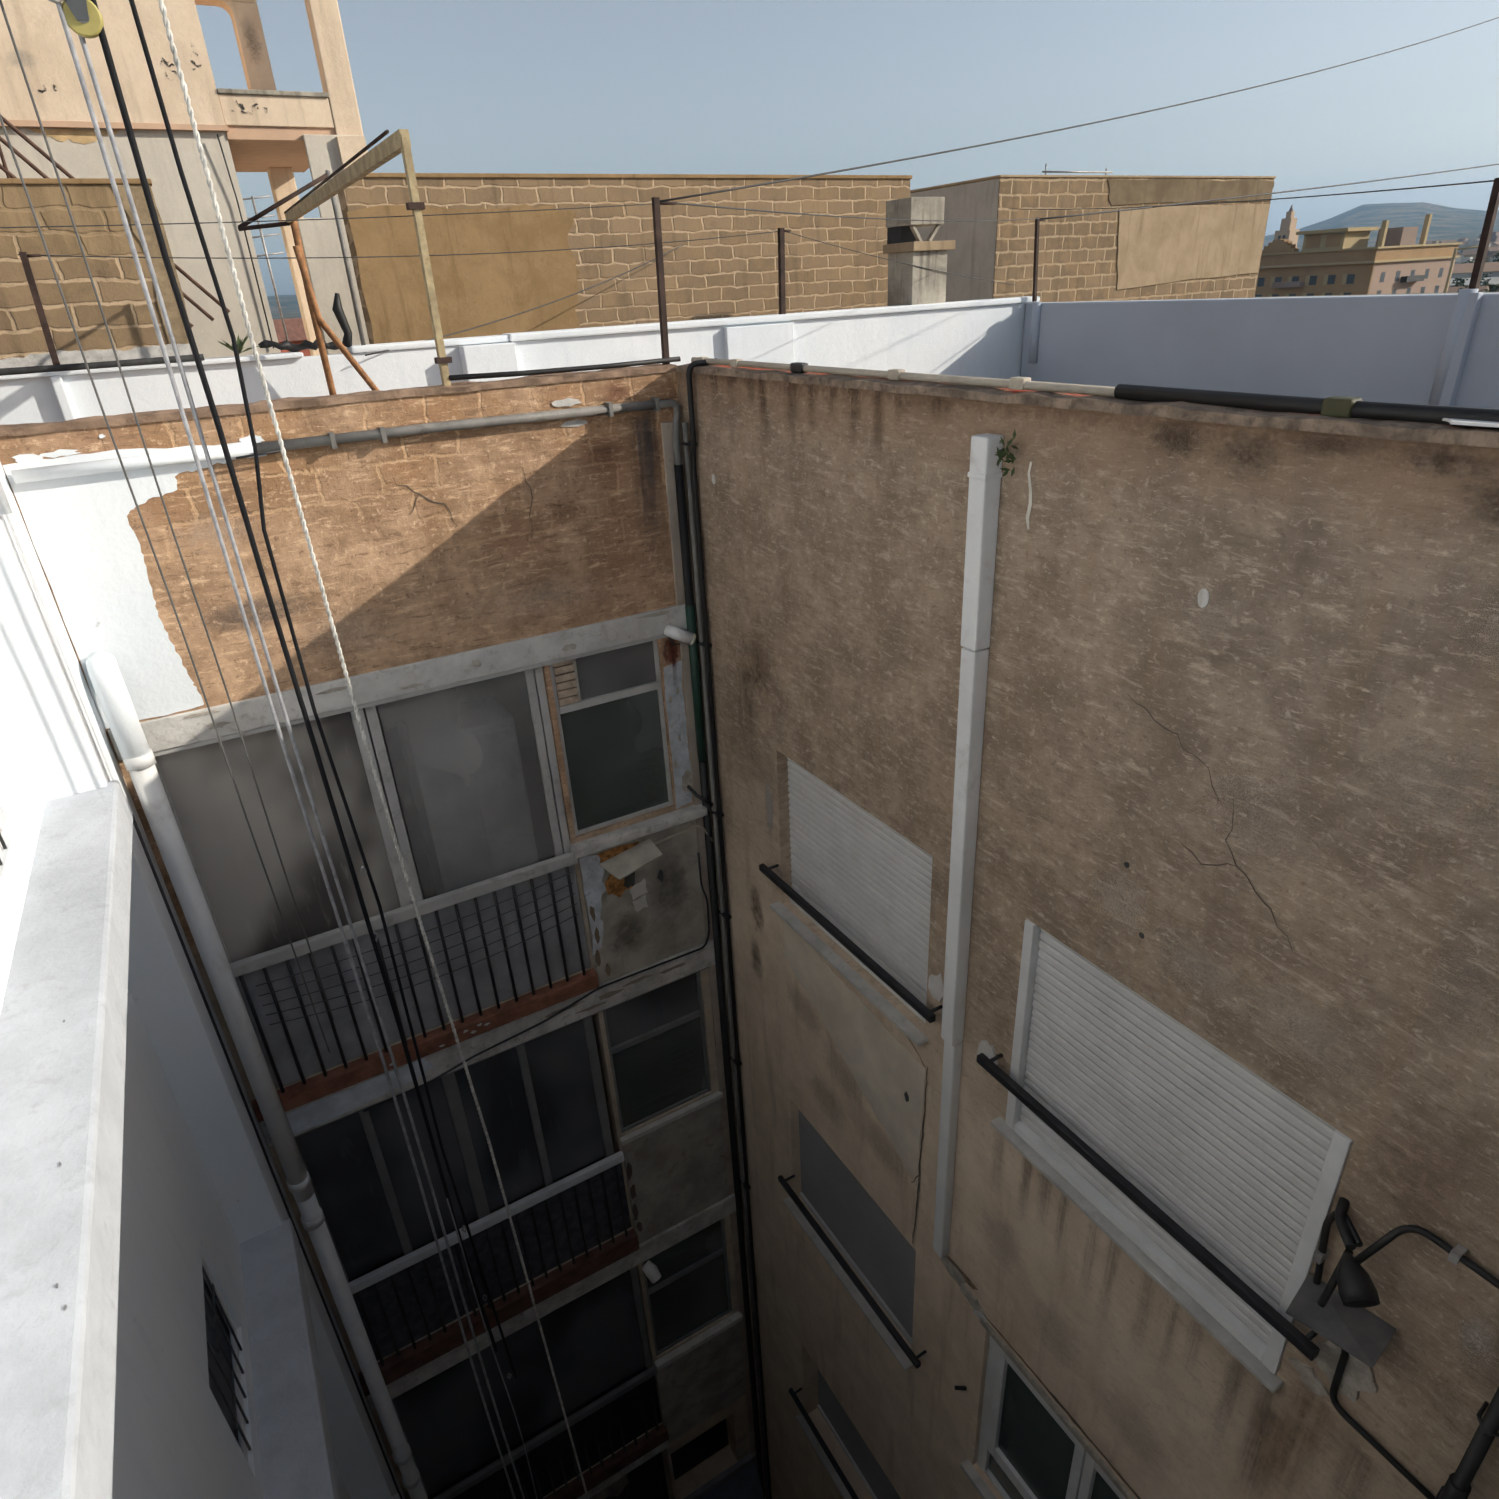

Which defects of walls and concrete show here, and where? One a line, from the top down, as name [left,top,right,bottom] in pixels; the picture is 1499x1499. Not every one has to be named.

peeling [184,710,231,729]
crack [1129,696,1293,951]